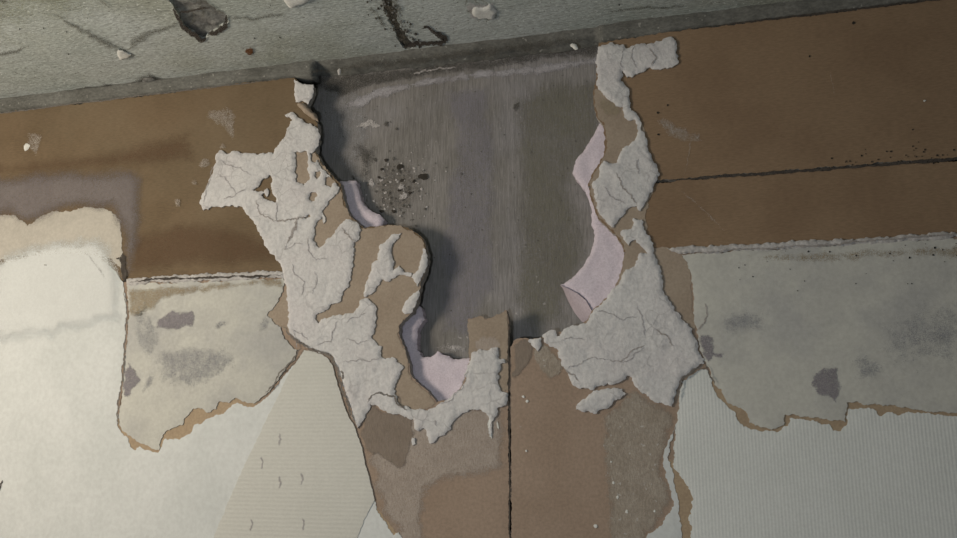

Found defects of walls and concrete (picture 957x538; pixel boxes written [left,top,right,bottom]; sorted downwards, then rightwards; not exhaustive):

crack [58,15,178,60]
crack [366,0,448,48]
flaking render [199,79,508,445]
flaking render [528,37,704,414]